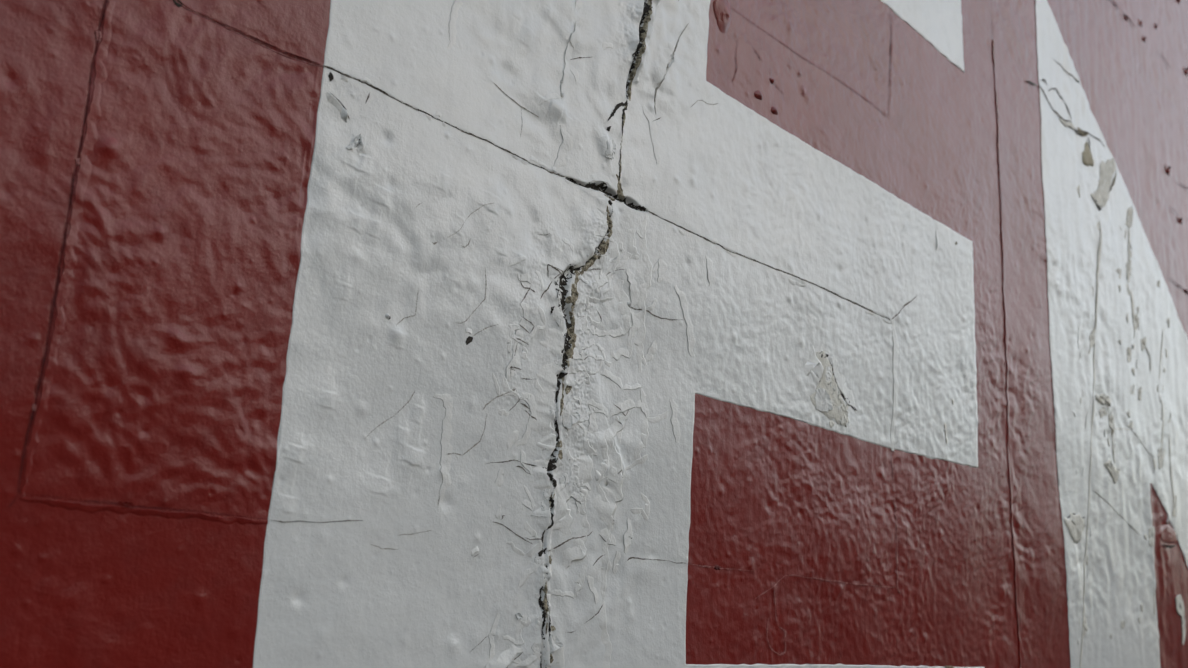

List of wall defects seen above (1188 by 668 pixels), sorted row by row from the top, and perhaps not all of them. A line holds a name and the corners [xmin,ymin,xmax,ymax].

crack [173,0,918,668]
peeling [548,227,681,546]
peeling [1064,141,1133,668]
peeling [1116,207,1177,546]
peeling [469,613,538,668]